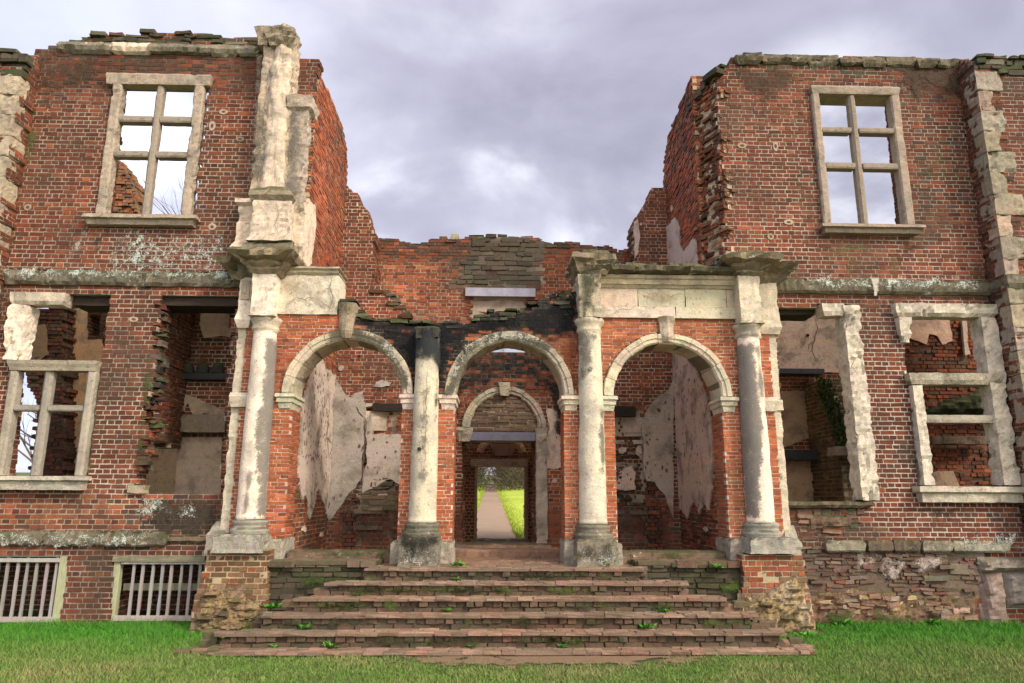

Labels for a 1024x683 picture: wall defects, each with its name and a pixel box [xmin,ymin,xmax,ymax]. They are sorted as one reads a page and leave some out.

flaking render [297,359,401,537]
leakage [329,297,586,479]
flaking render [615,353,715,519]
leakage [859,557,940,579]